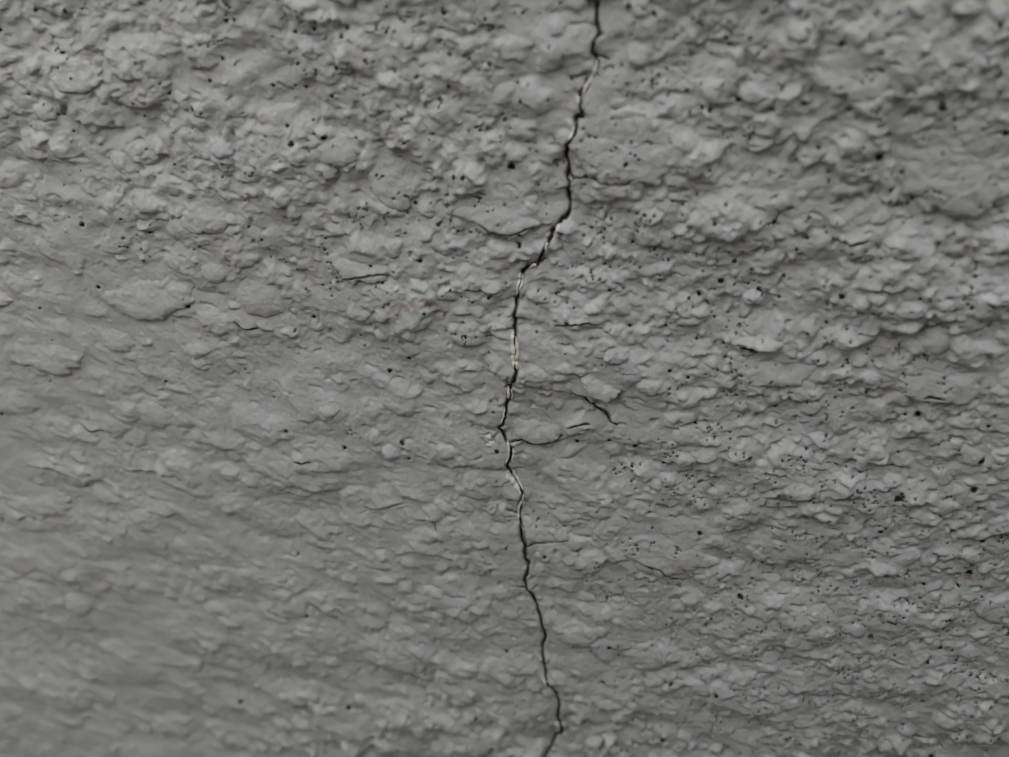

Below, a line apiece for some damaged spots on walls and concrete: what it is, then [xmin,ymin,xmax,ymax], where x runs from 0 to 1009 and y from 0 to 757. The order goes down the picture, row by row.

crack [474,0,629,757]